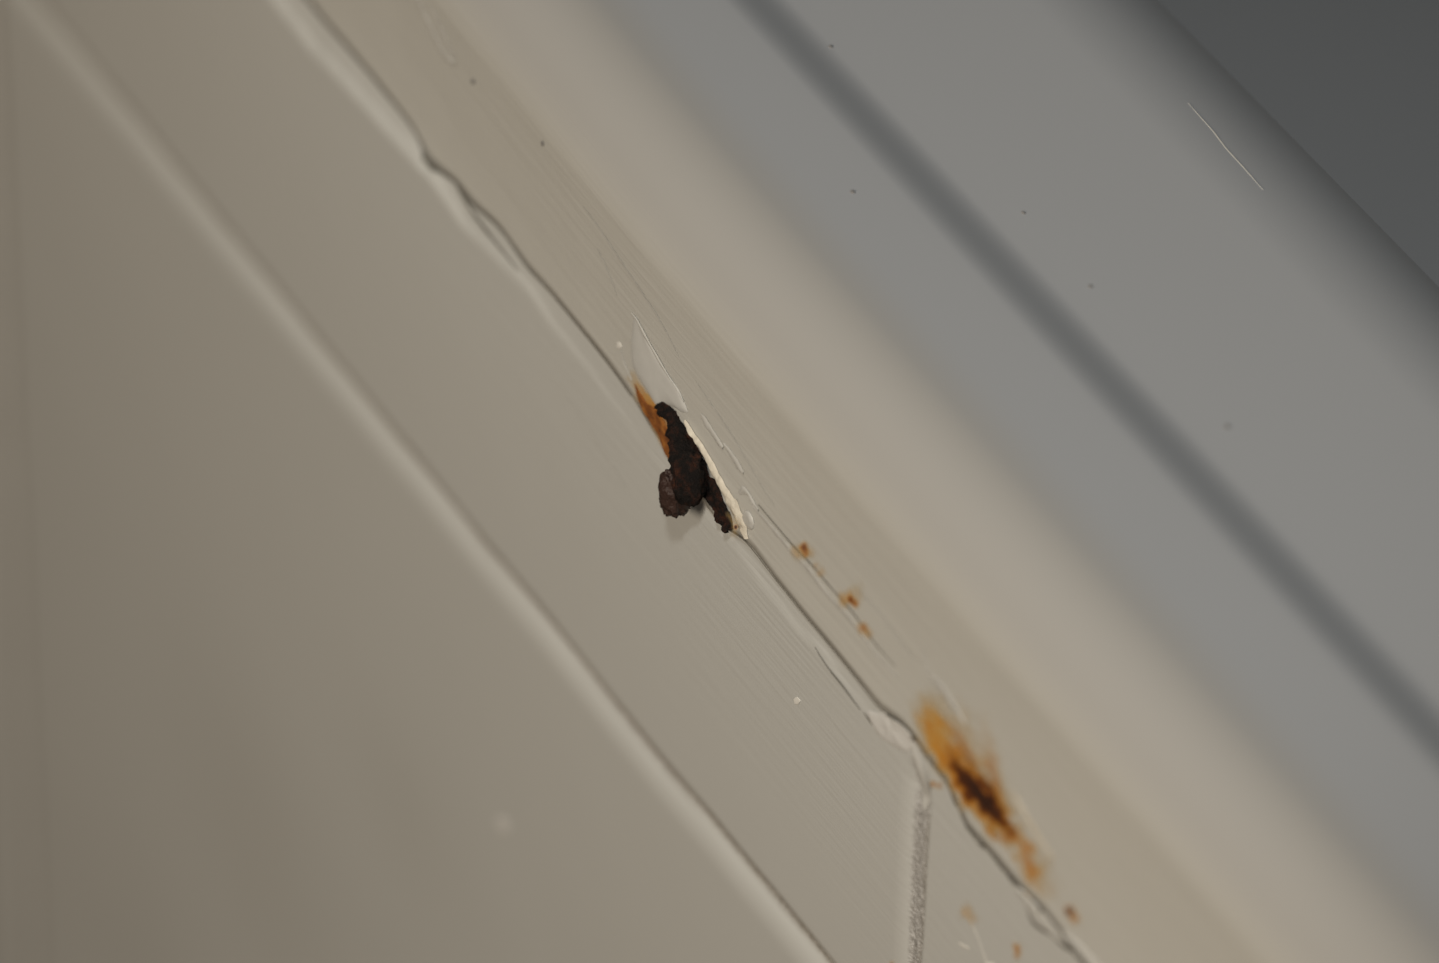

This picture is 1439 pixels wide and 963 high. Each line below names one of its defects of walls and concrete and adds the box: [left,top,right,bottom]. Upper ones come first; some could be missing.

crack [306,0,631,396]
peeling [620,313,748,539]
crack [730,504,1085,963]
rust [920,707,1039,880]